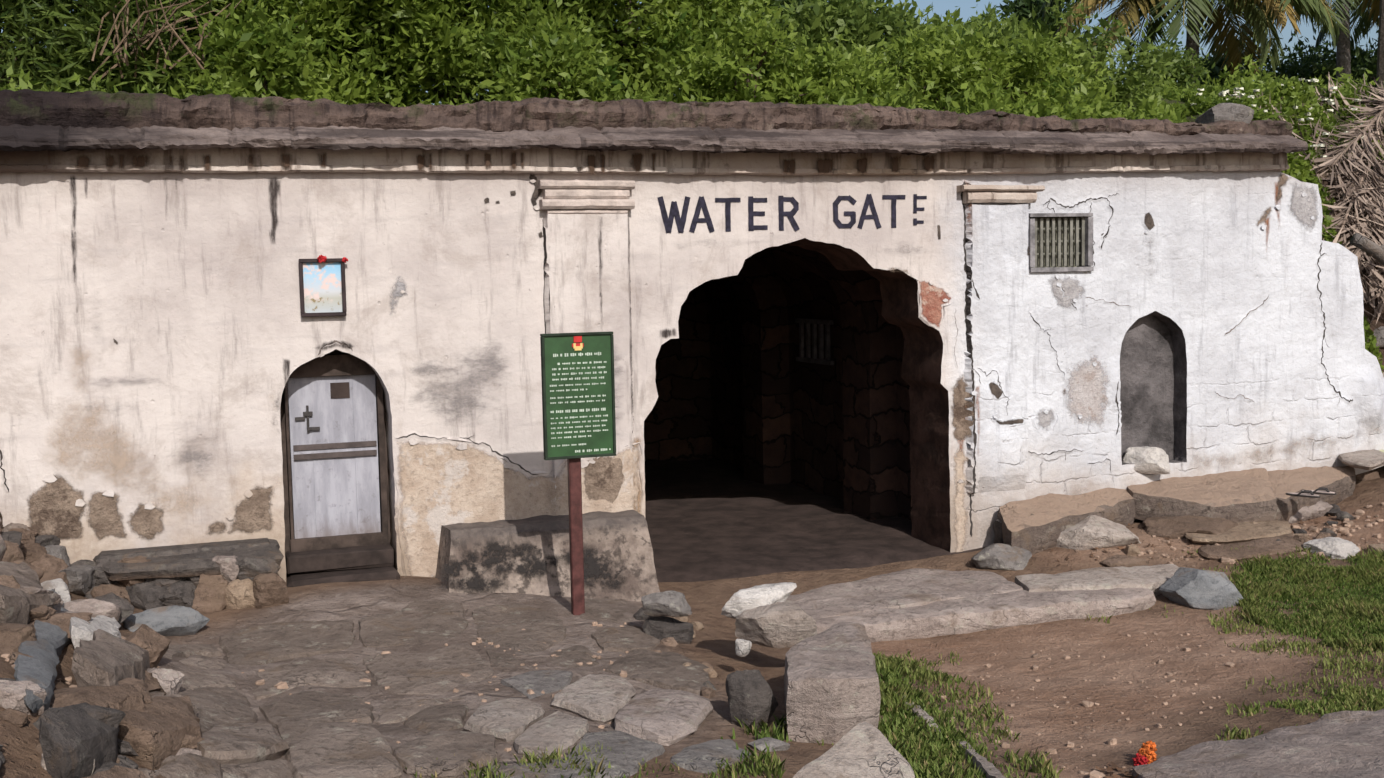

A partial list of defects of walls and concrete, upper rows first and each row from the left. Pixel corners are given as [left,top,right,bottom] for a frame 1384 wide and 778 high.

water stain [203,155,211,171]
water stain [269,154,291,239]
spalling [917,280,953,329]
crack [952,180,1011,537]
crack [1028,191,1131,381]
crack [1314,241,1353,407]
crack [0,398,13,493]
flaking render [952,358,1108,552]
flaking render [28,474,163,540]
flaking render [209,487,272,534]
flaking render [393,437,645,577]
mould [441,542,626,592]